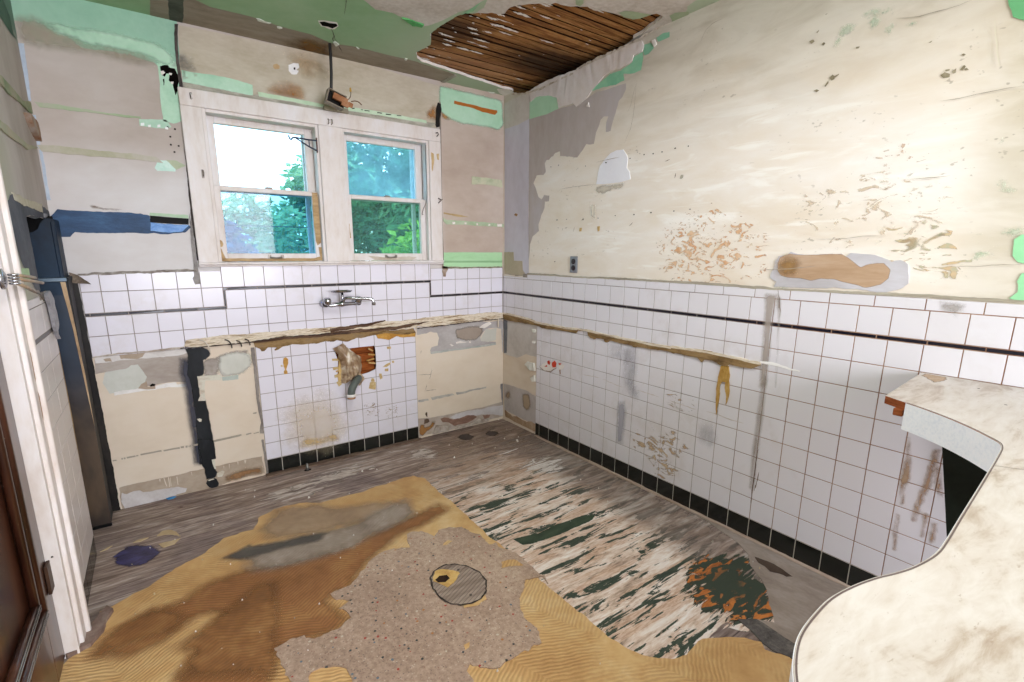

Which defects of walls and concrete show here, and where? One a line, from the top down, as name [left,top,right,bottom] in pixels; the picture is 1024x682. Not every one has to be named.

peeling [364,0,696,108]
peeling [139,119,171,130]
peeling [155,160,176,172]
peeling [804,144,972,279]
peeling [659,209,766,283]
flaking render [95,349,187,363]
peeling [197,375,222,401]
peeling [418,384,536,437]
flaking render [119,456,265,509]